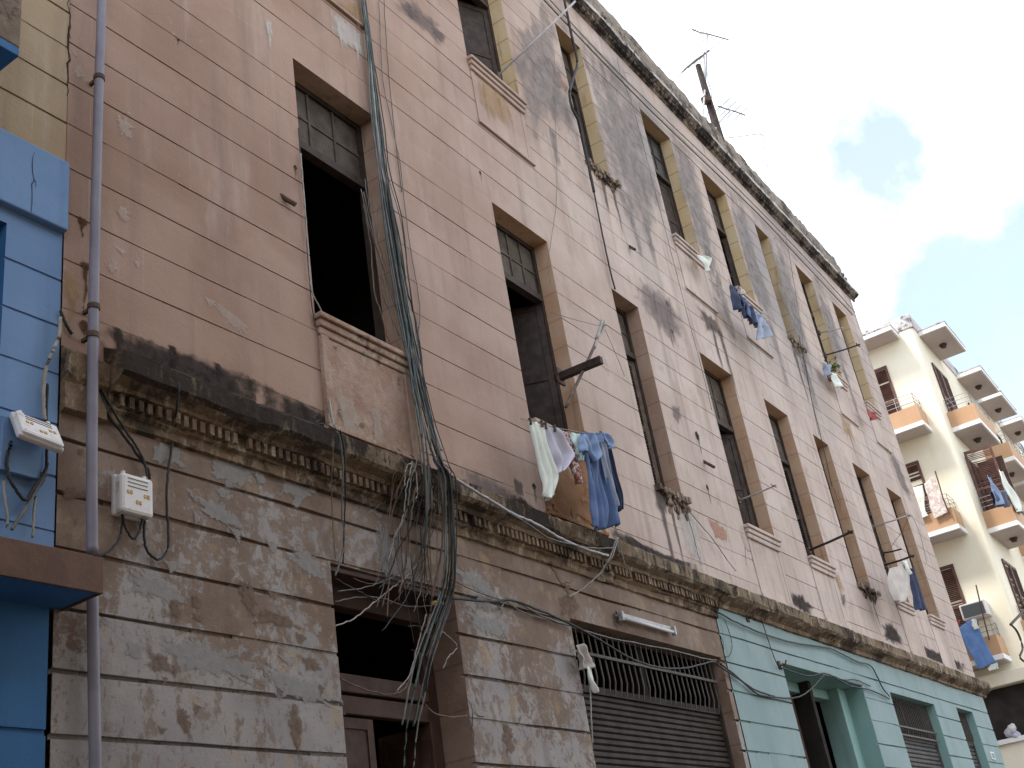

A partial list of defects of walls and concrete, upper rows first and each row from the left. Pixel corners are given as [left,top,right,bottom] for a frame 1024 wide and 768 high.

leakage [518,15,573,123]
leakage [585,62,657,250]
leakage [111,327,326,427]
peeling [153,442,185,468]
peeling [188,459,265,543]
peeling [239,581,322,671]
leakage [792,595,812,614]
leakage [863,580,902,643]
peeling [147,649,178,685]
peeling [177,701,201,735]
peeling [288,704,303,754]
peeling [502,721,515,753]